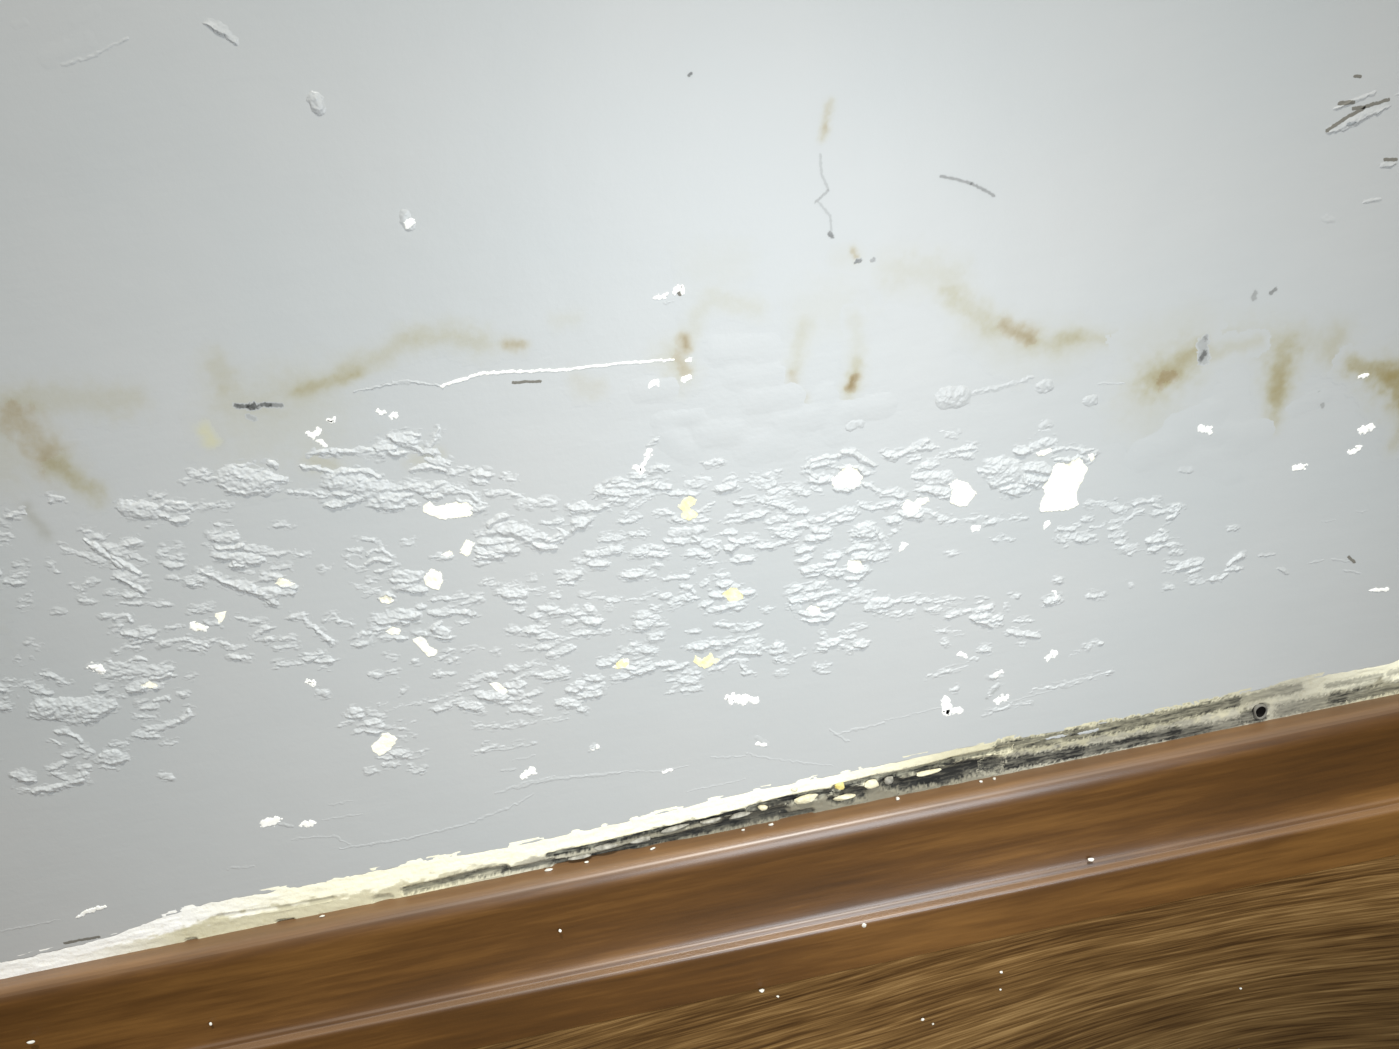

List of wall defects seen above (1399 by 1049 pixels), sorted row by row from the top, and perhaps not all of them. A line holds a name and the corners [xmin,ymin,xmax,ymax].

spalling [1325,74,1399,134]
spalling [1380,158,1398,168]
leakage [0,299,594,547]
leakage [561,360,615,407]
leakage [638,230,1399,463]
peeling [0,408,1290,798]
flaking render [1197,660,1399,722]
flaking render [0,734,1027,979]